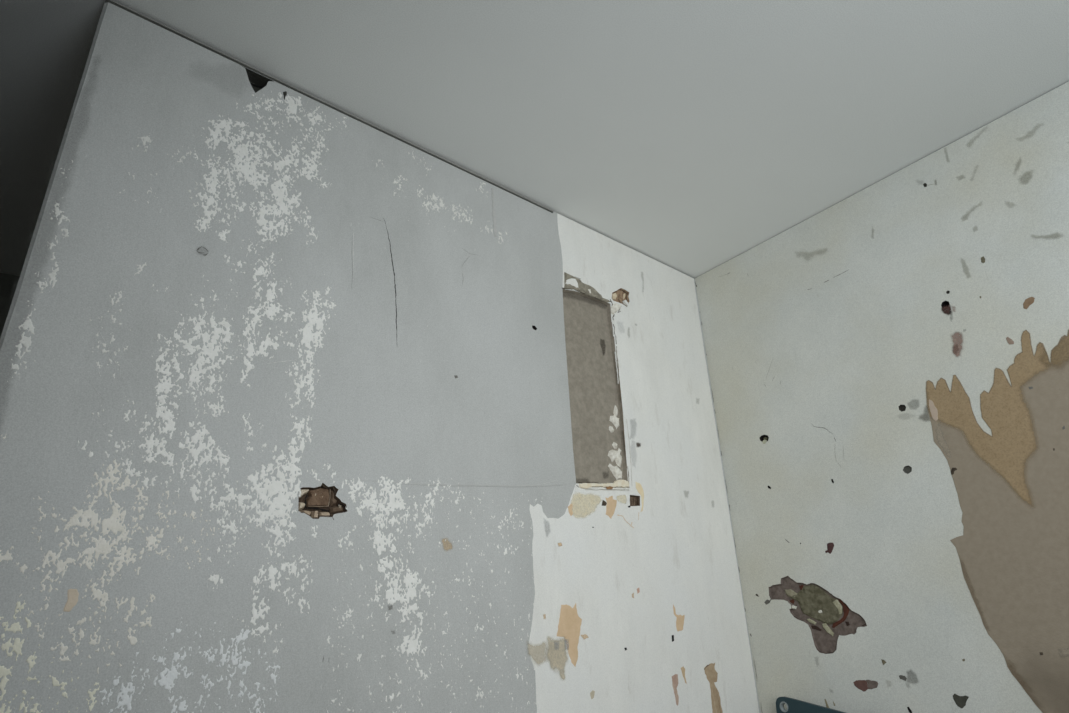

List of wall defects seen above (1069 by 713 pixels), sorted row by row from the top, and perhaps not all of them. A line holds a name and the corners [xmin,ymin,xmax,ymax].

crack [352,216,397,335]
flaking render [0,66,759,713]
spalling [756,576,867,654]
peeling [926,329,1069,713]